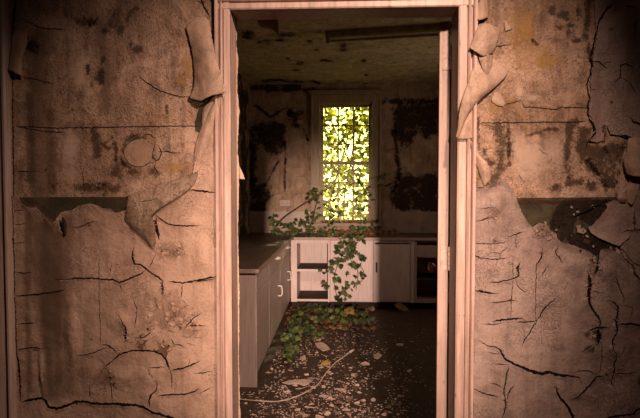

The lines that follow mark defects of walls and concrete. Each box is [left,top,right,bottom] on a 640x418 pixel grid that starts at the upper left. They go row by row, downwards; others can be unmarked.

leakage [75,126,145,196]
crack [12,72,217,418]
peeling [12,127,217,418]
mould [238,74,321,238]
mould [382,97,438,212]
crack [479,207,496,221]
leakage [477,117,628,196]
peeling [473,178,640,418]
crack [474,211,640,418]
crack [482,2,638,149]